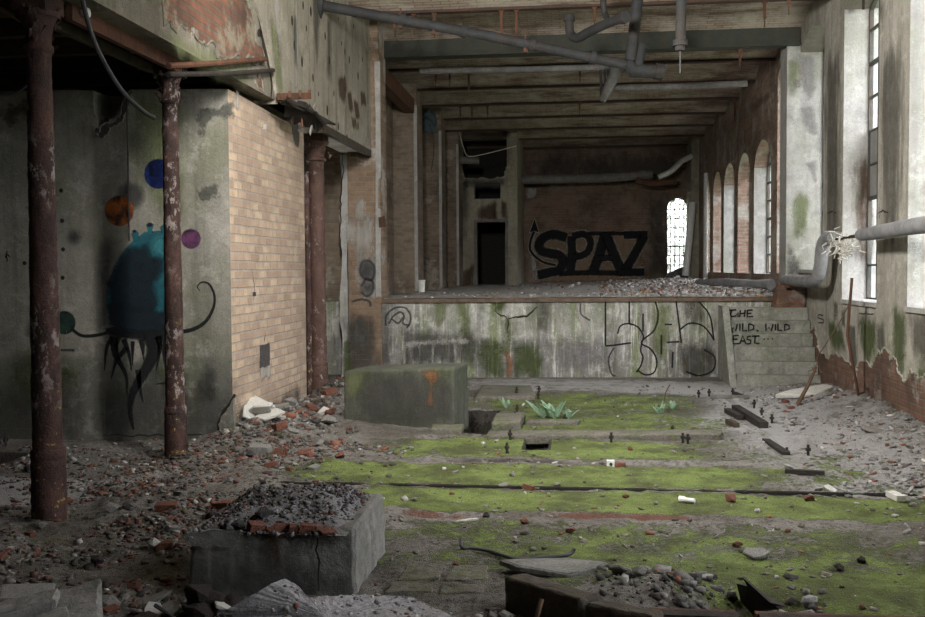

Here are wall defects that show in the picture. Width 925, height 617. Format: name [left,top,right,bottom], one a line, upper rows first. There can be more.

spalling [161,0,268,93]
spalling [810,322,925,422]